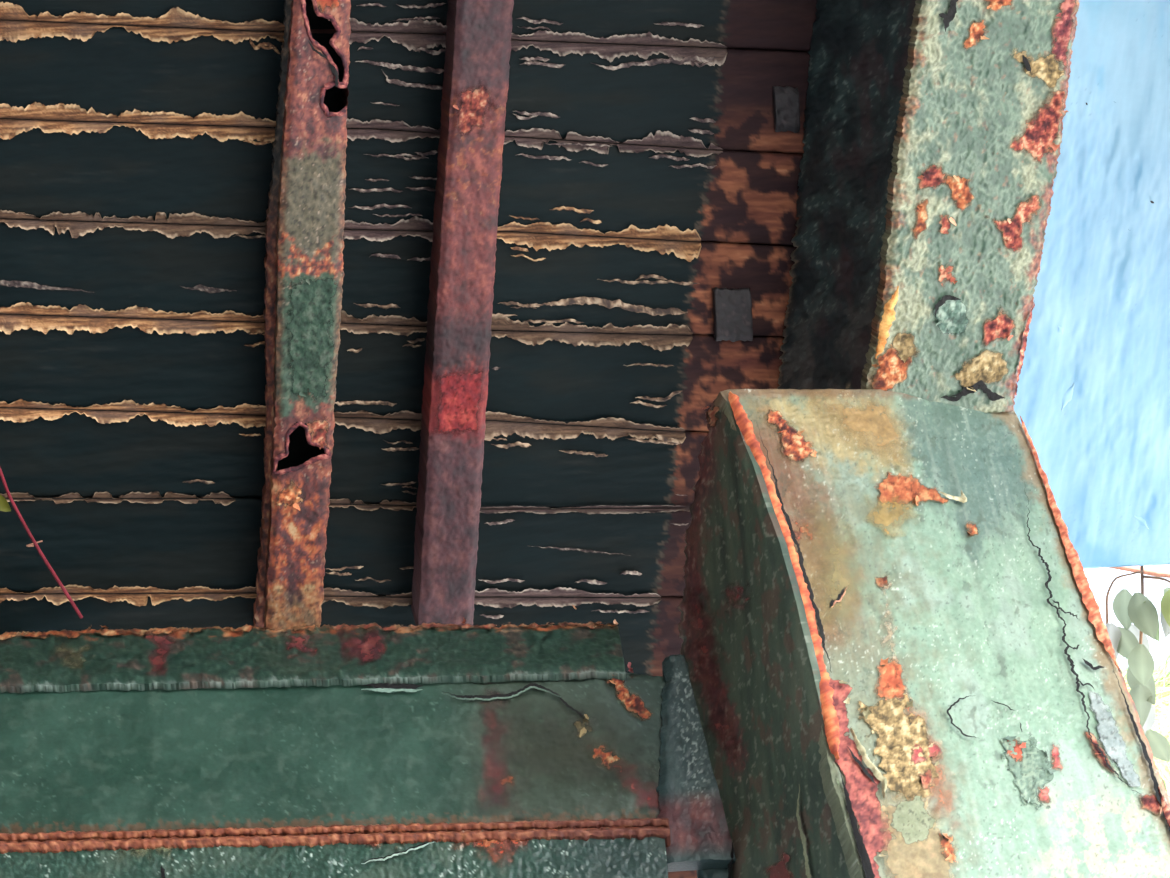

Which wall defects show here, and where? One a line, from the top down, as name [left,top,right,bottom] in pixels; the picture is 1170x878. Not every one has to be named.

peeling [0,2,285,54]
peeling [511,17,727,70]
rust [1010,0,1076,163]
peeling [0,102,276,145]
peeling [497,206,702,262]
rust [912,164,974,239]
peeling [0,302,265,347]
peeling [491,297,693,367]
rust [954,301,1035,396]
rust [869,472,967,536]
rust [702,391,852,760]
crack [1024,490,1170,831]